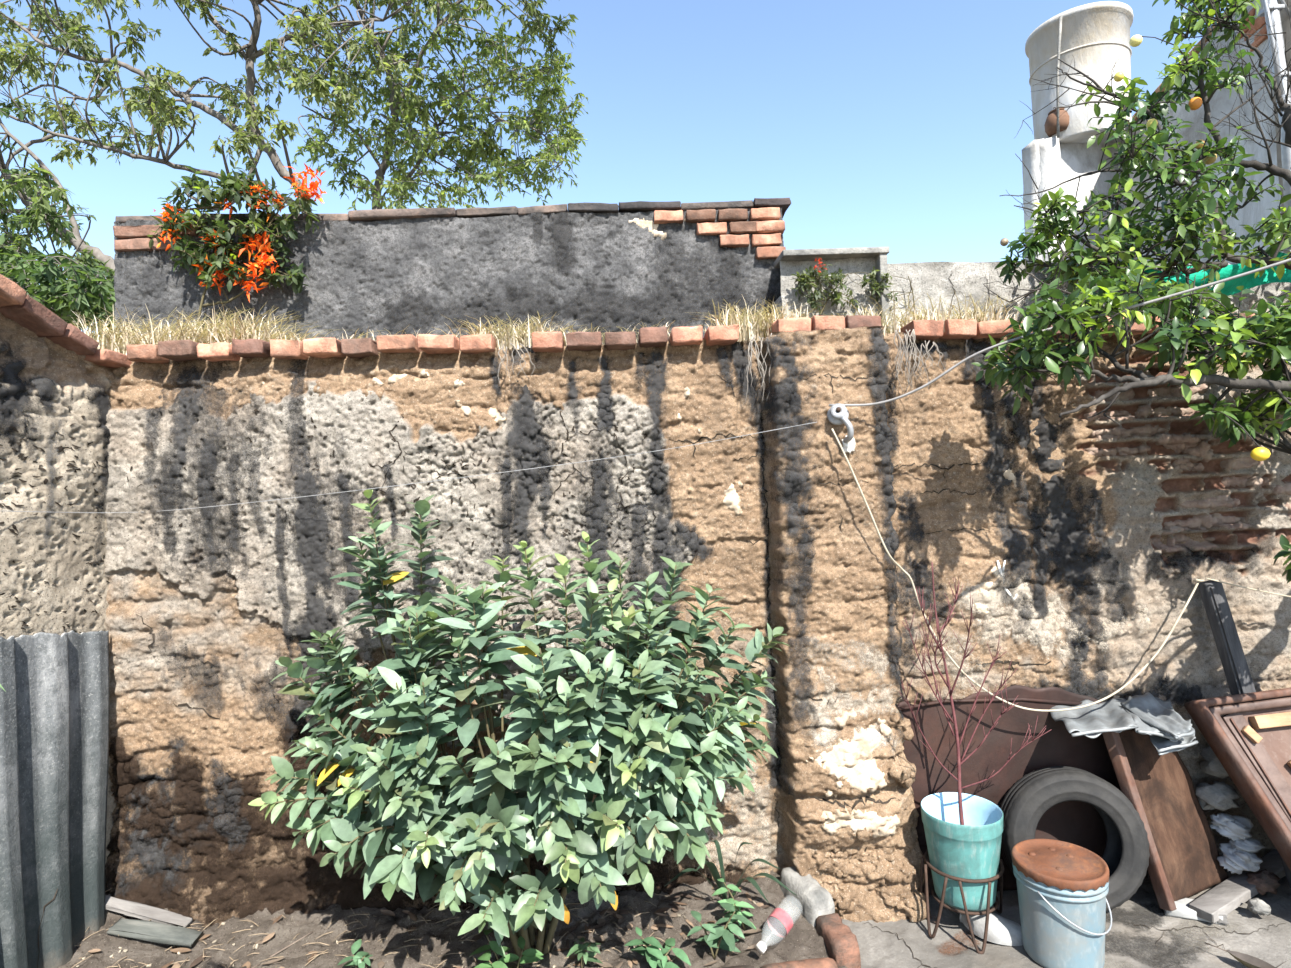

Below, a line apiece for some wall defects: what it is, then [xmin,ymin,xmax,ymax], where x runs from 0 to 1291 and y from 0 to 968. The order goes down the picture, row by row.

spalling [629,207,786,260]
leakage [0,343,61,542]
leakage [87,386,112,566]
peeling [47,344,169,409]
peeling [210,351,656,552]
leakage [383,212,781,639]
spalling [1084,384,1291,555]
leakage [105,359,480,926]
leakage [614,328,1151,895]
peeling [806,708,901,843]
leakage [507,853,576,893]
crack [864,922,937,968]